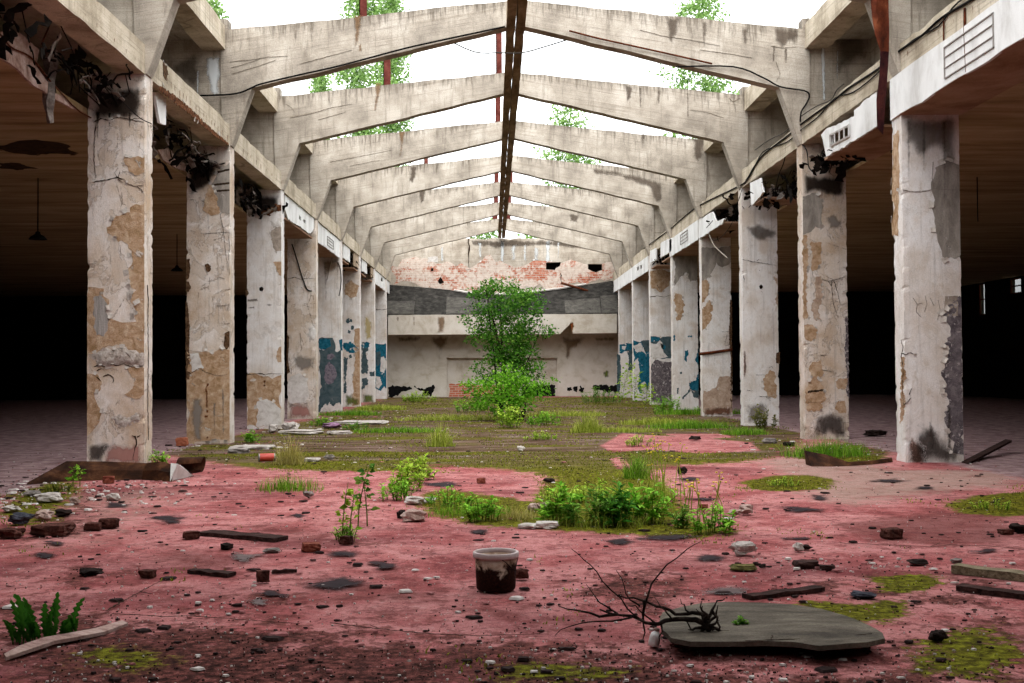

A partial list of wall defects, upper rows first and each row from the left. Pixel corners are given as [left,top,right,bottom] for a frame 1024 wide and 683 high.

leakage [668,19,678,40]
leakage [773,29,796,60]
corrosion [870,0,889,134]
crack [92,115,143,192]
leakage [693,138,704,159]
spalling [928,156,961,264]
flaking render [87,204,144,436]
flaking render [185,259,230,444]
peeling [247,318,436,428]
flaking render [391,255,615,293]
peeling [567,300,732,416]
peeling [937,296,964,456]